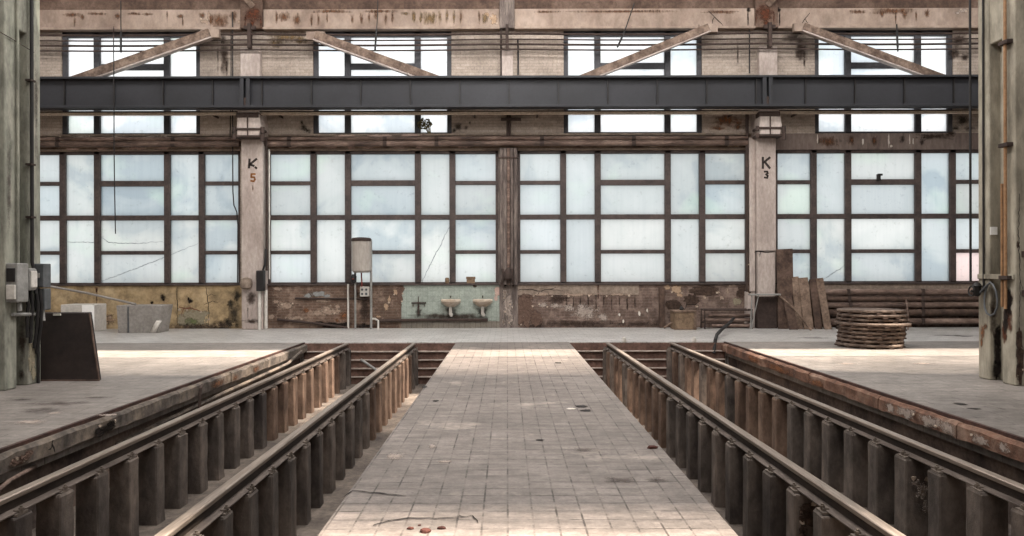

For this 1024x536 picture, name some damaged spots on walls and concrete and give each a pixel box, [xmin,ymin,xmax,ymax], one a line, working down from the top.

rust [747,5,781,26]
water stain [176,291,258,329]
flaking render [494,286,592,328]
flaking render [663,263,751,310]
rust [1002,288,1013,343]